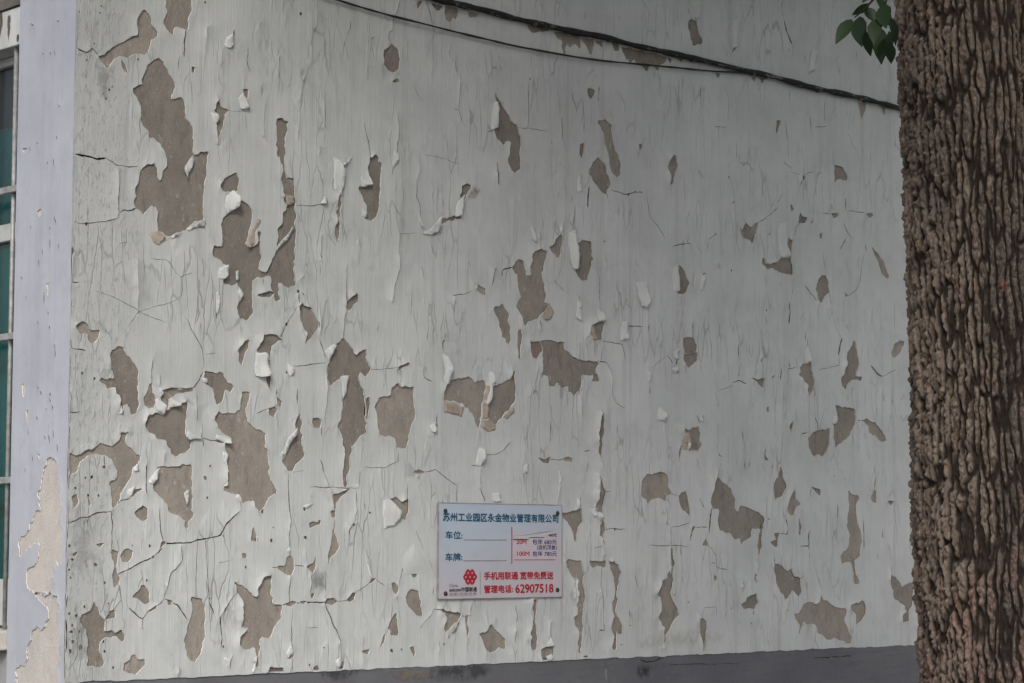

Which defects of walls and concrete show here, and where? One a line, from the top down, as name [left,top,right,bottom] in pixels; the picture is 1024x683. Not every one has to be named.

spalling [86,0,250,245]
spalling [212,118,319,343]
crack [423,217,442,235]
crack [214,291,222,314]
crack [288,363,318,376]
spalling [442,352,516,432]
spalling [494,222,600,395]
crack [597,321,640,363]
crack [471,447,494,466]
spalling [15,346,322,683]
crack [120,522,228,573]
spalling [234,338,416,673]